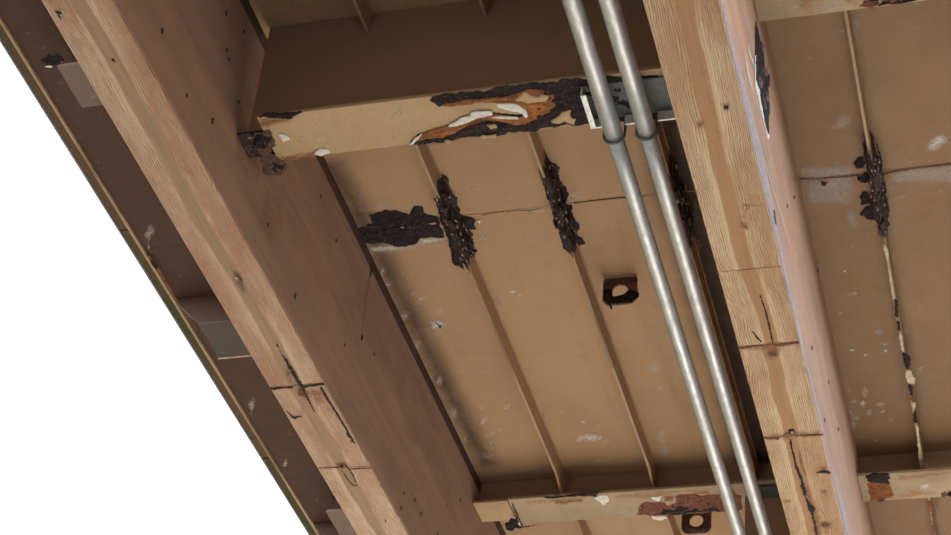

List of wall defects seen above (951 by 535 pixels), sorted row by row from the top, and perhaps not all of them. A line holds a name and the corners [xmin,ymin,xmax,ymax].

rust [860,0,916,8]
rust [410,78,597,145]
rust [606,75,630,122]
peeling [358,205,444,251]
spalling [721,0,828,453]
crack [738,295,799,349]
crack [270,344,371,486]
rust [637,492,725,516]
crack [764,433,824,535]
rust [866,472,894,502]